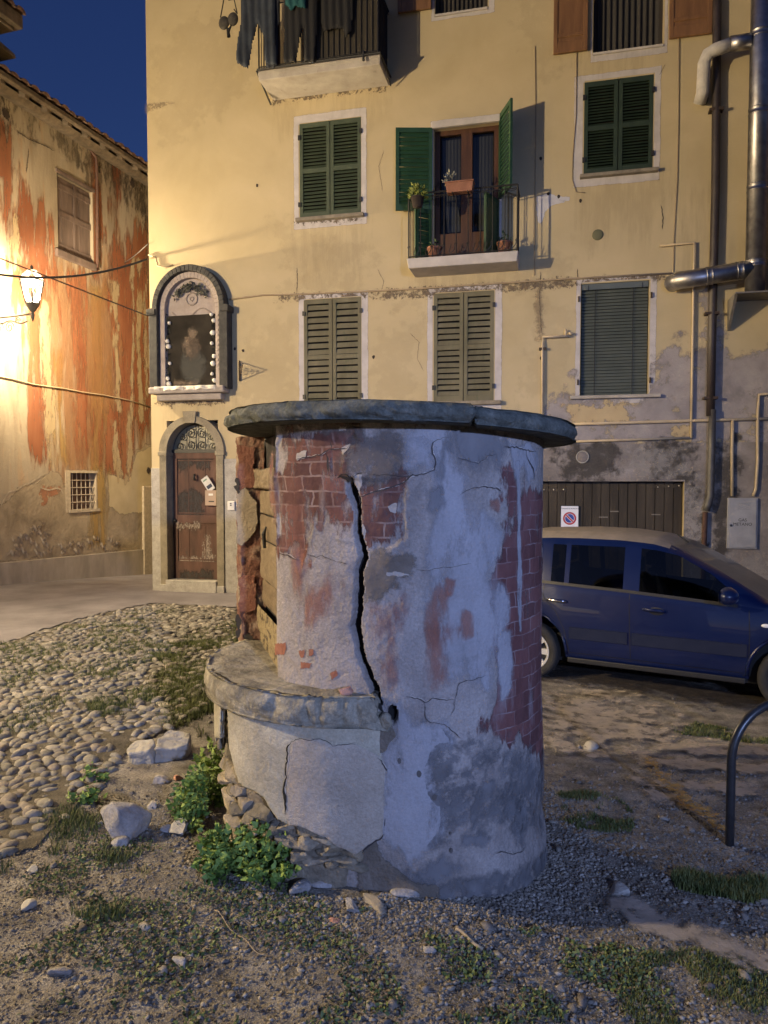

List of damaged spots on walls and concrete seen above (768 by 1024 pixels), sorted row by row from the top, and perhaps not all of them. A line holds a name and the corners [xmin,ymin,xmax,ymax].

peeling [544,287,768,444]
flaking render [269,423,408,568]
crack [279,436,535,712]
flaking render [477,462,543,778]
crack [283,738,353,812]
crack [411,676,484,738]
leakage [408,733,548,899]